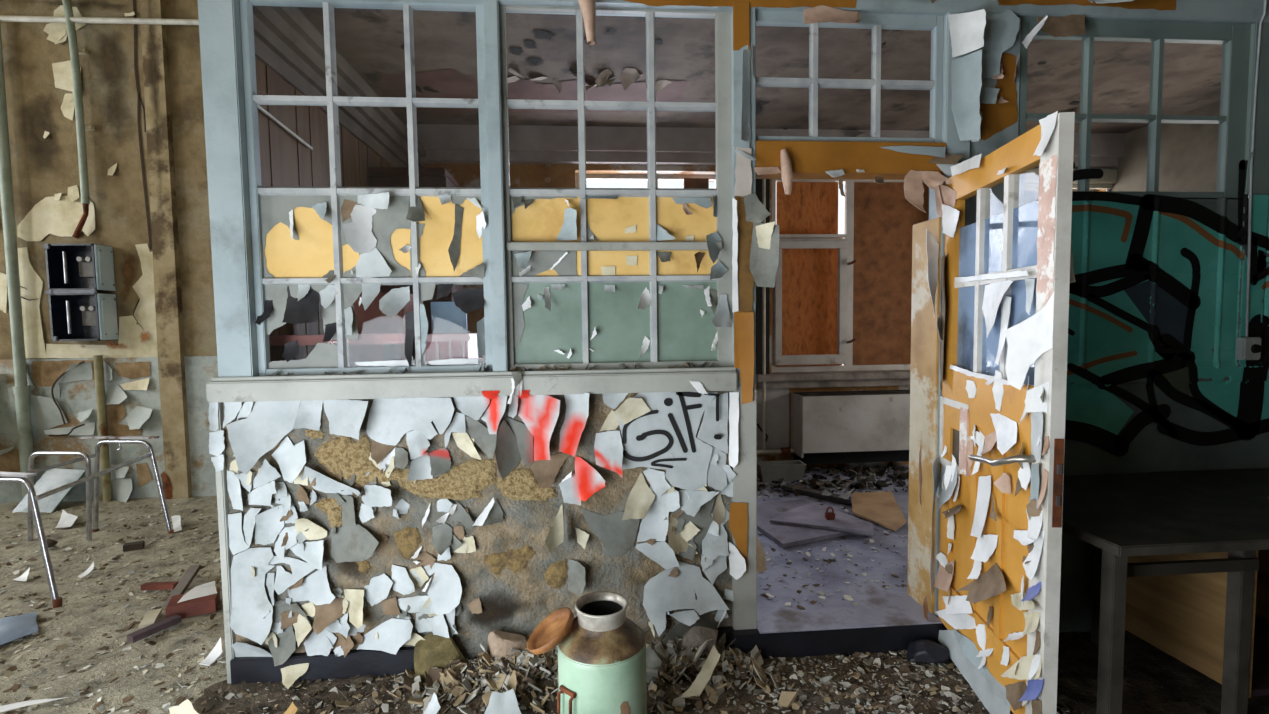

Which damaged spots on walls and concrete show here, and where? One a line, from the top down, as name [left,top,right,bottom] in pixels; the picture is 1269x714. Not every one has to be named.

peeling [43,5,87,45]
peeling [578,0,616,46]
peeling [624,0,861,24]
peeling [52,60,81,121]
peeling [507,30,687,113]
peeling [826,169,887,197]
peeling [0,185,158,436]
peeling [208,44,793,689]
peeling [881,0,1176,714]
peeling [110,463,153,502]